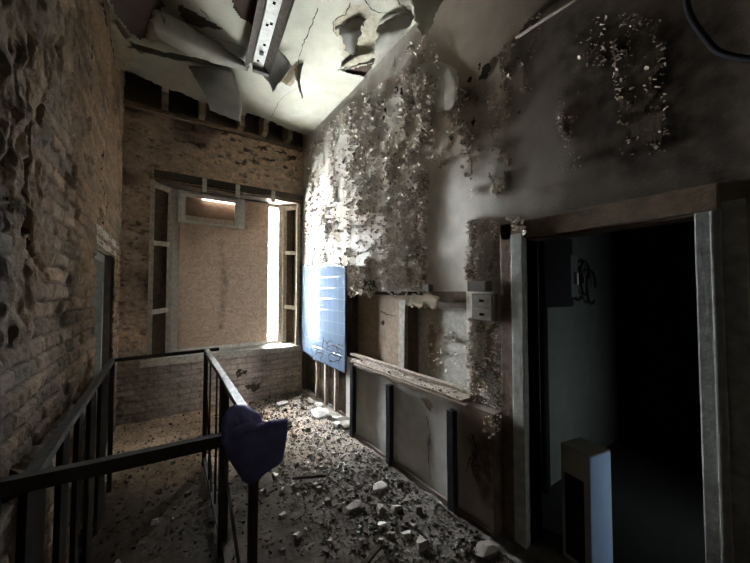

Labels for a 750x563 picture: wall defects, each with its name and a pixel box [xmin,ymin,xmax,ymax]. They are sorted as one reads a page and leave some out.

peeling [235,4,541,298]
peeling [576,13,670,155]
crack [312,337,343,362]